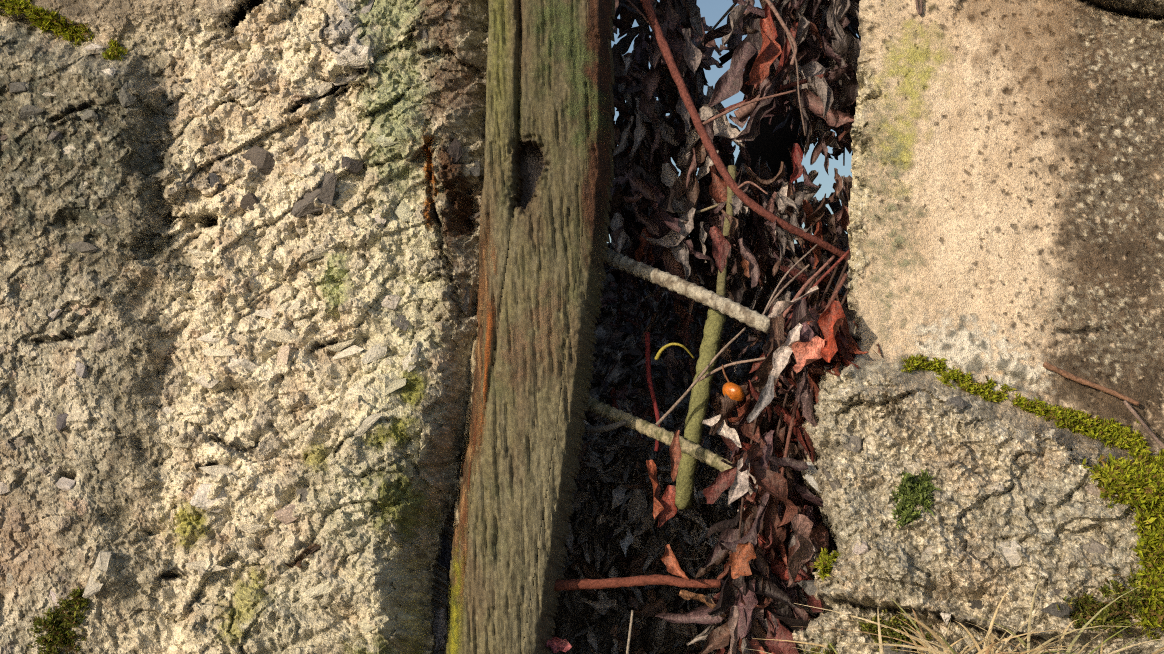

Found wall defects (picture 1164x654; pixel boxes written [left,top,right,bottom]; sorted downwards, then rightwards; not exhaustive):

water stain [913,0,1164,451]